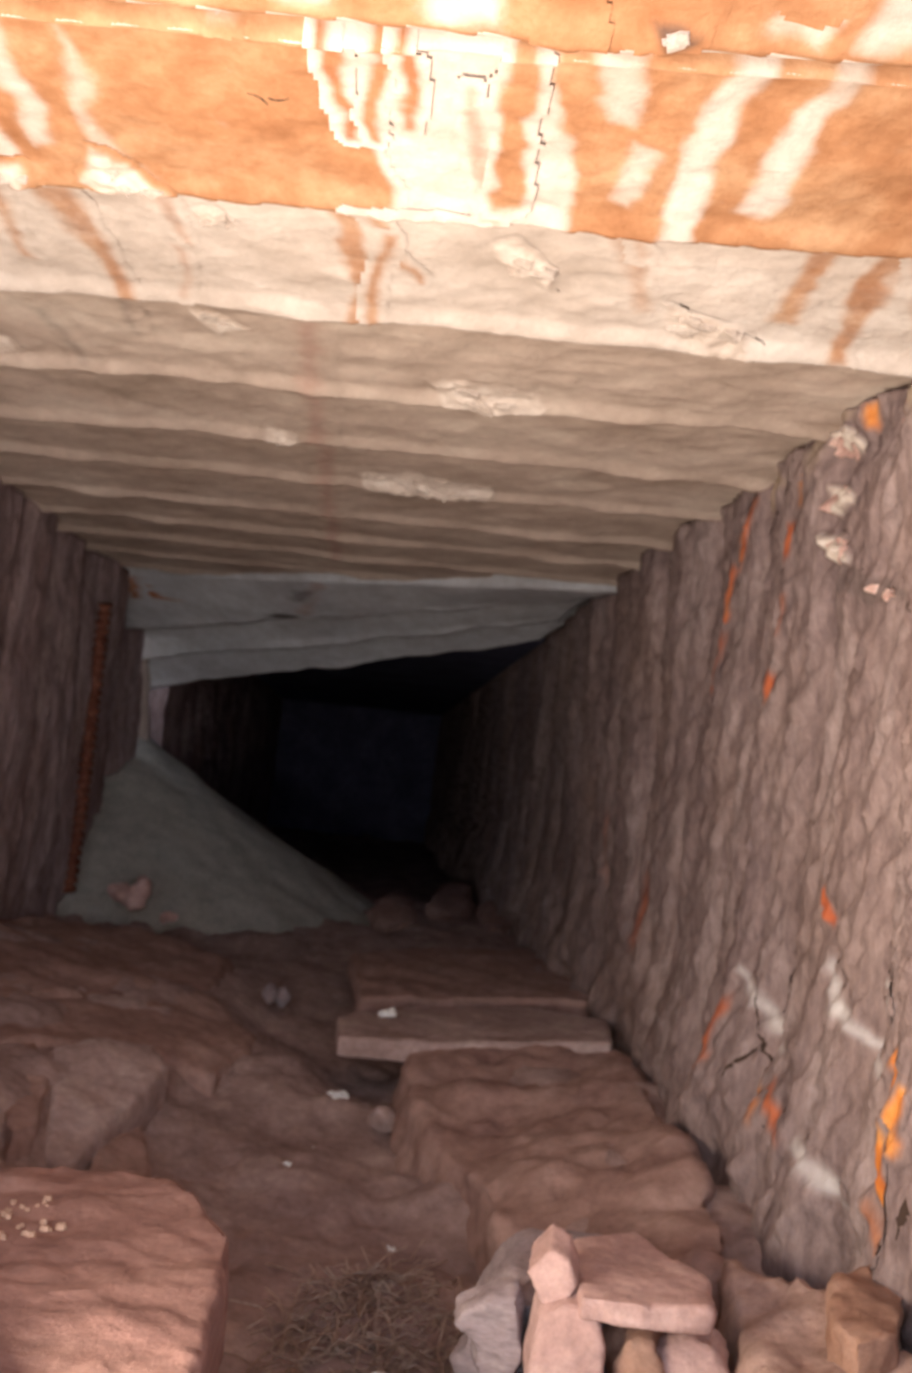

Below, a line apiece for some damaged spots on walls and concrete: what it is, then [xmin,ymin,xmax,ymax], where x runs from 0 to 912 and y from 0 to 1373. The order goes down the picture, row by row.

corrosion [0,0,912,370]
corrosion [707,491,768,703]
corrosion [760,659,781,712]
corrosion [771,474,804,642]
corrosion [853,1034,912,1271]